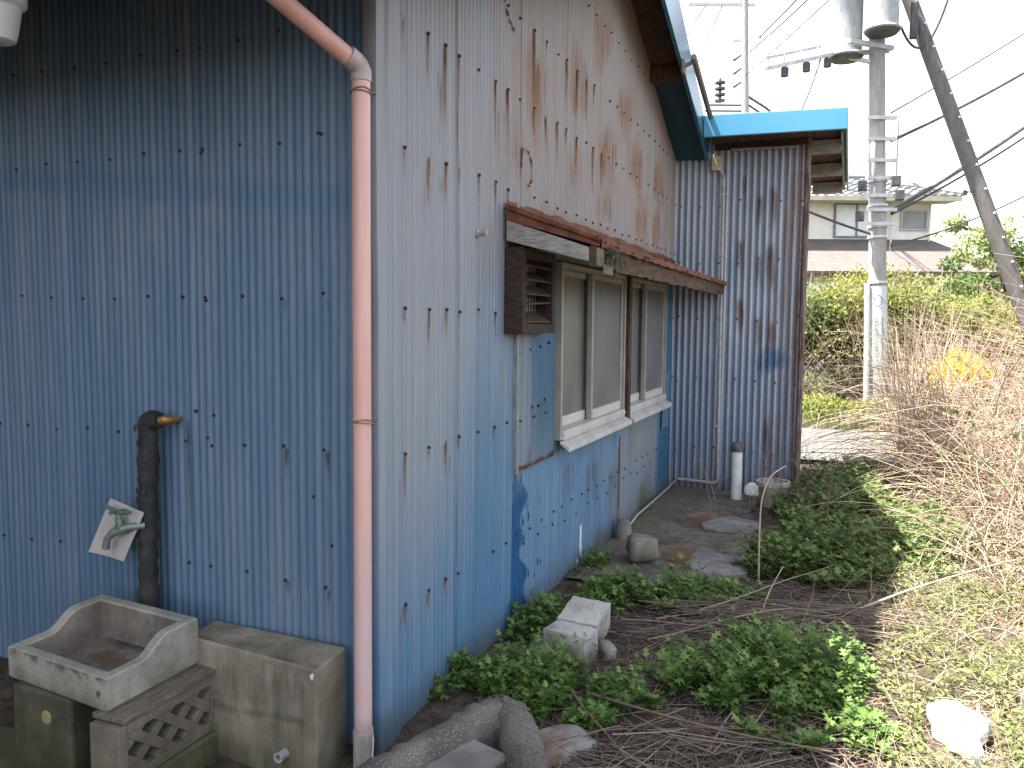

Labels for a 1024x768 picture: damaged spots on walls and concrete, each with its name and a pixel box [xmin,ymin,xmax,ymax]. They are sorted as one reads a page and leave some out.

rust [444,47,460,110]
rust [565,63,595,107]
rust [533,109,577,164]
rust [592,144,613,183]
rust [515,451,554,477]